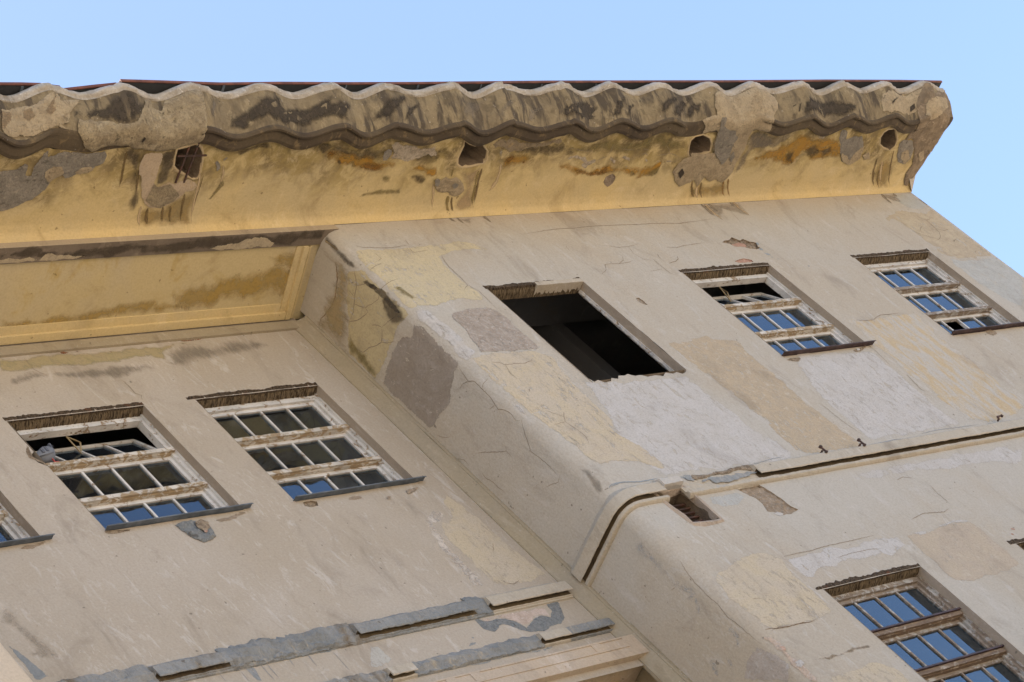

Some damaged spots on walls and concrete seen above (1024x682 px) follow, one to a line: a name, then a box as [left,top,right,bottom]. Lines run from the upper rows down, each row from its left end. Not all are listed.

spalling [0,89,228,211]
spalling [435,138,562,196]
spalling [603,87,778,187]
spalling [879,82,952,186]
damp [13,247,44,257]
damp [48,231,373,372]
crack [320,240,482,352]
spalling [723,237,778,263]
crack [460,359,559,490]
spalling [176,512,245,542]
spalling [738,485,798,516]
spalling [482,607,549,625]